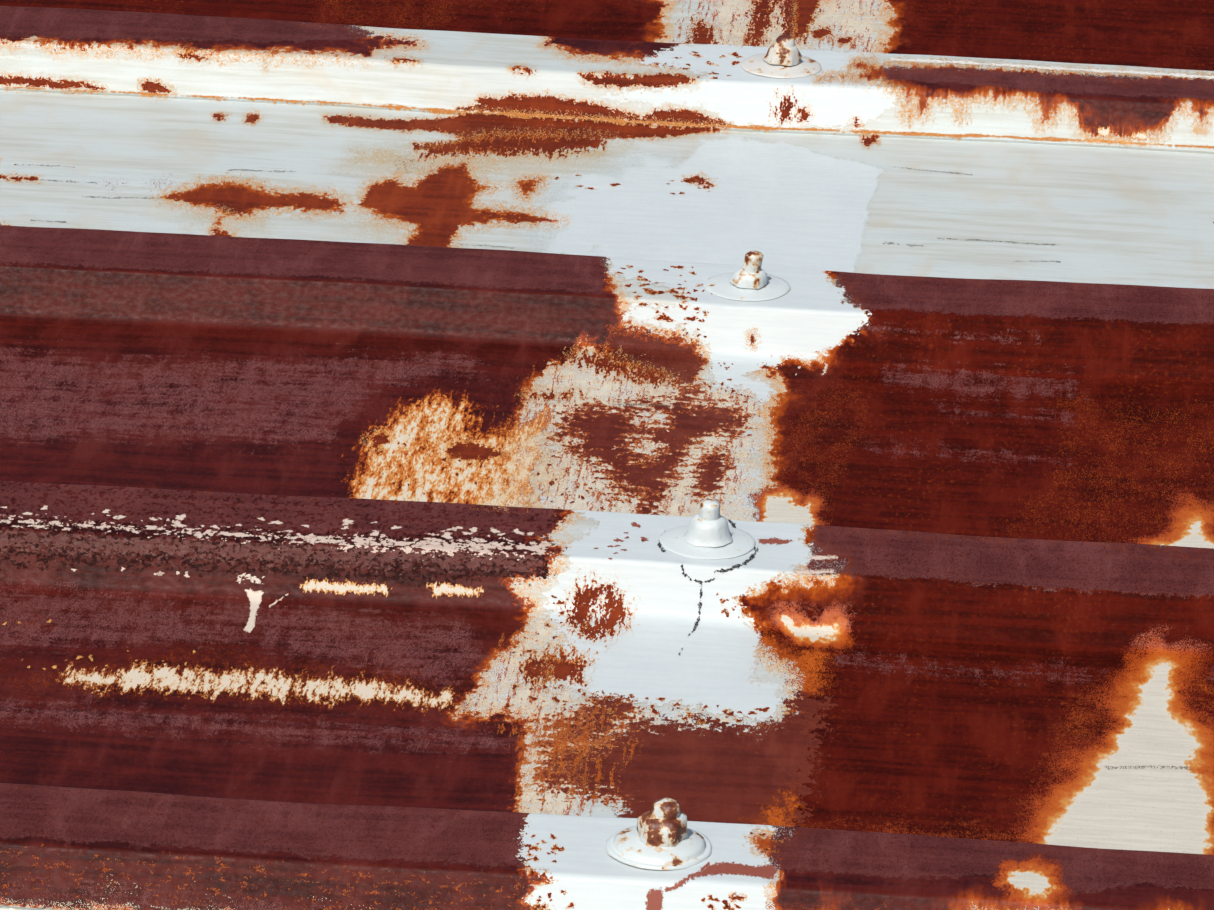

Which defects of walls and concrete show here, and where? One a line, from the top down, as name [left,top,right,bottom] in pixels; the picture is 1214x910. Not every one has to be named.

corrosion [0,0,1214,151]
corrosion [0,158,46,189]
peeling [0,505,556,561]
peeling [237,573,265,584]
peeling [299,576,392,597]
peeling [426,579,484,599]
corrosion [560,571,638,652]
peeling [0,634,477,721]
corrosion [645,861,778,910]